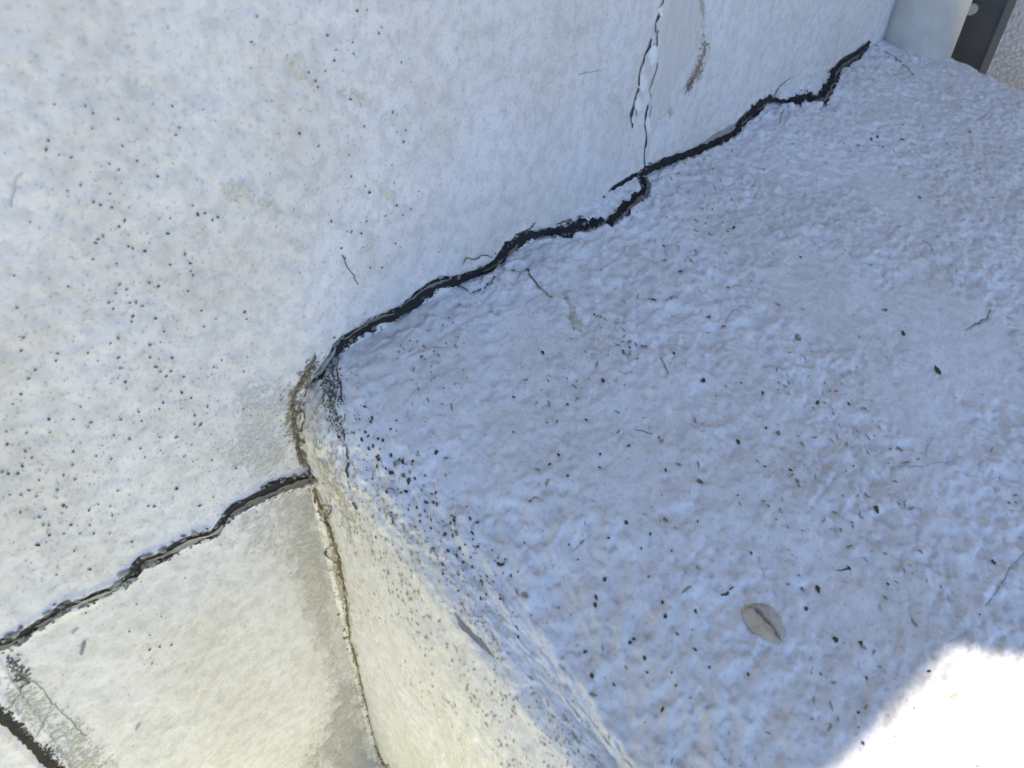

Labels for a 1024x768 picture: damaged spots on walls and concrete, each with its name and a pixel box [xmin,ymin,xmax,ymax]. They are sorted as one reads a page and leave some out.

crack [630,12,660,128]
damp [213,370,380,768]
crack [0,41,913,727]